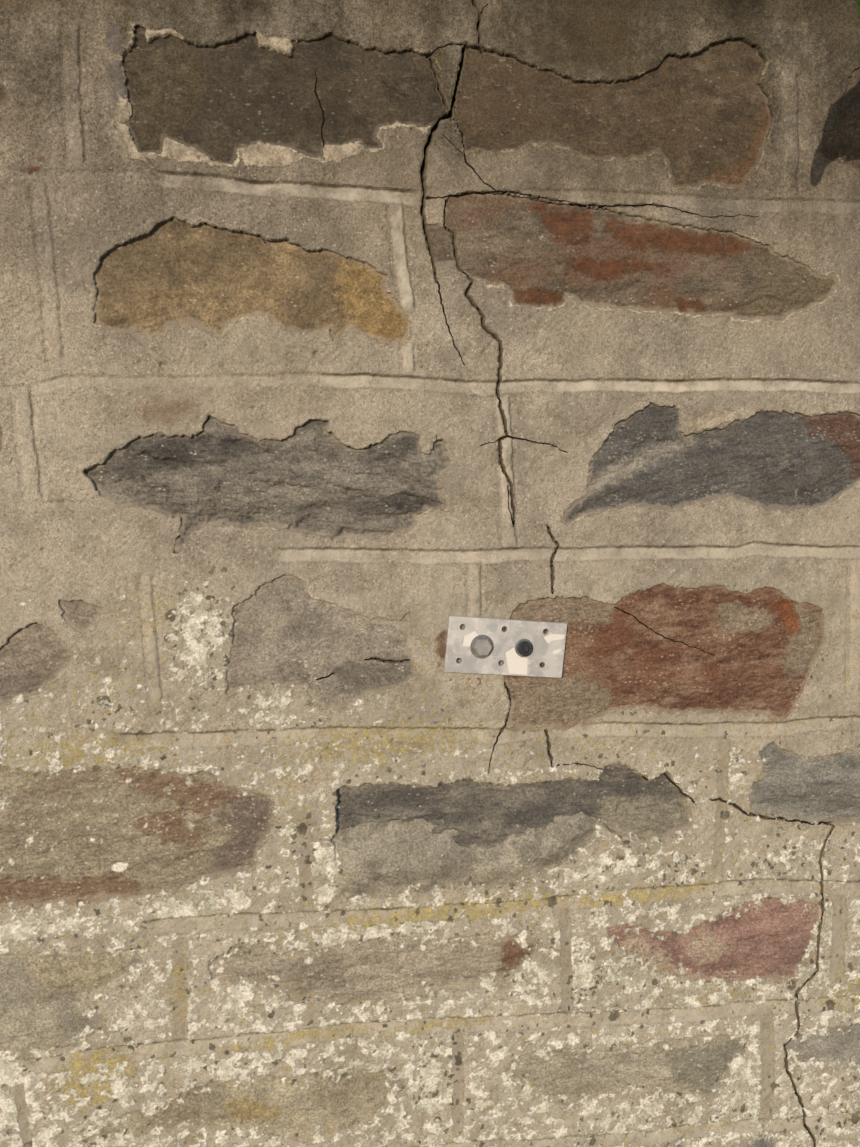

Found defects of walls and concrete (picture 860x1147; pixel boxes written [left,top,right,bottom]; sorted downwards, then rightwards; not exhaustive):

spalling [116,24,775,191]
spalling [93,217,413,348]
crack [419,0,758,527]
spalling [424,191,841,324]
spalling [84,416,450,557]
spalling [560,403,860,527]
crack [546,526,560,594]
spalling [225,575,420,714]
crack [488,682,512,774]
spalling [503,584,825,733]
spalling [336,763,695,865]
crack [640,772,835,1147]